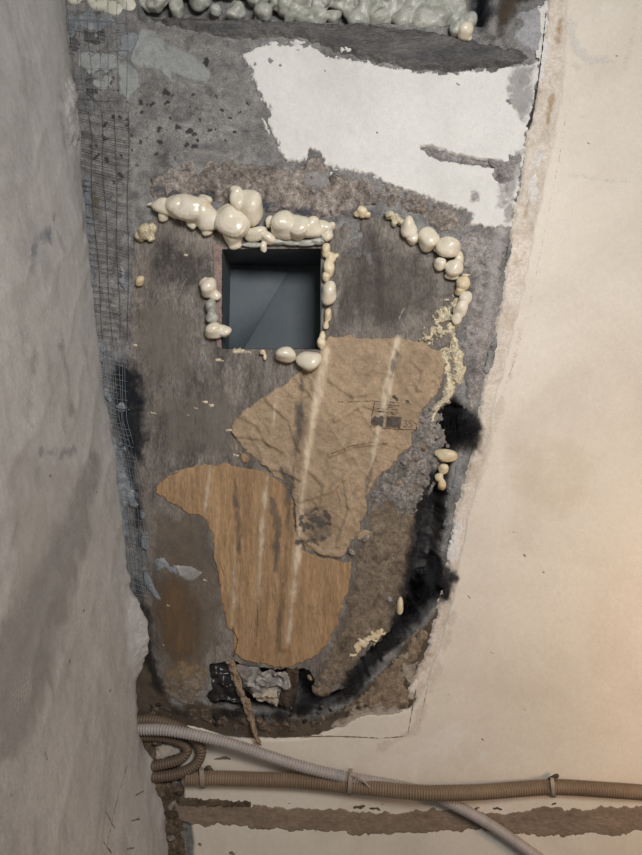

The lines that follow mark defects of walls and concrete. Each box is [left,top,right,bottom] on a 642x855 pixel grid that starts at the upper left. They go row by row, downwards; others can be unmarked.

damp [484,228,507,312]
damp [112,363,146,540]
peeling [145,0,567,734]
damp [136,500,438,739]
spalling [174,797,492,836]
spalling [475,803,642,838]